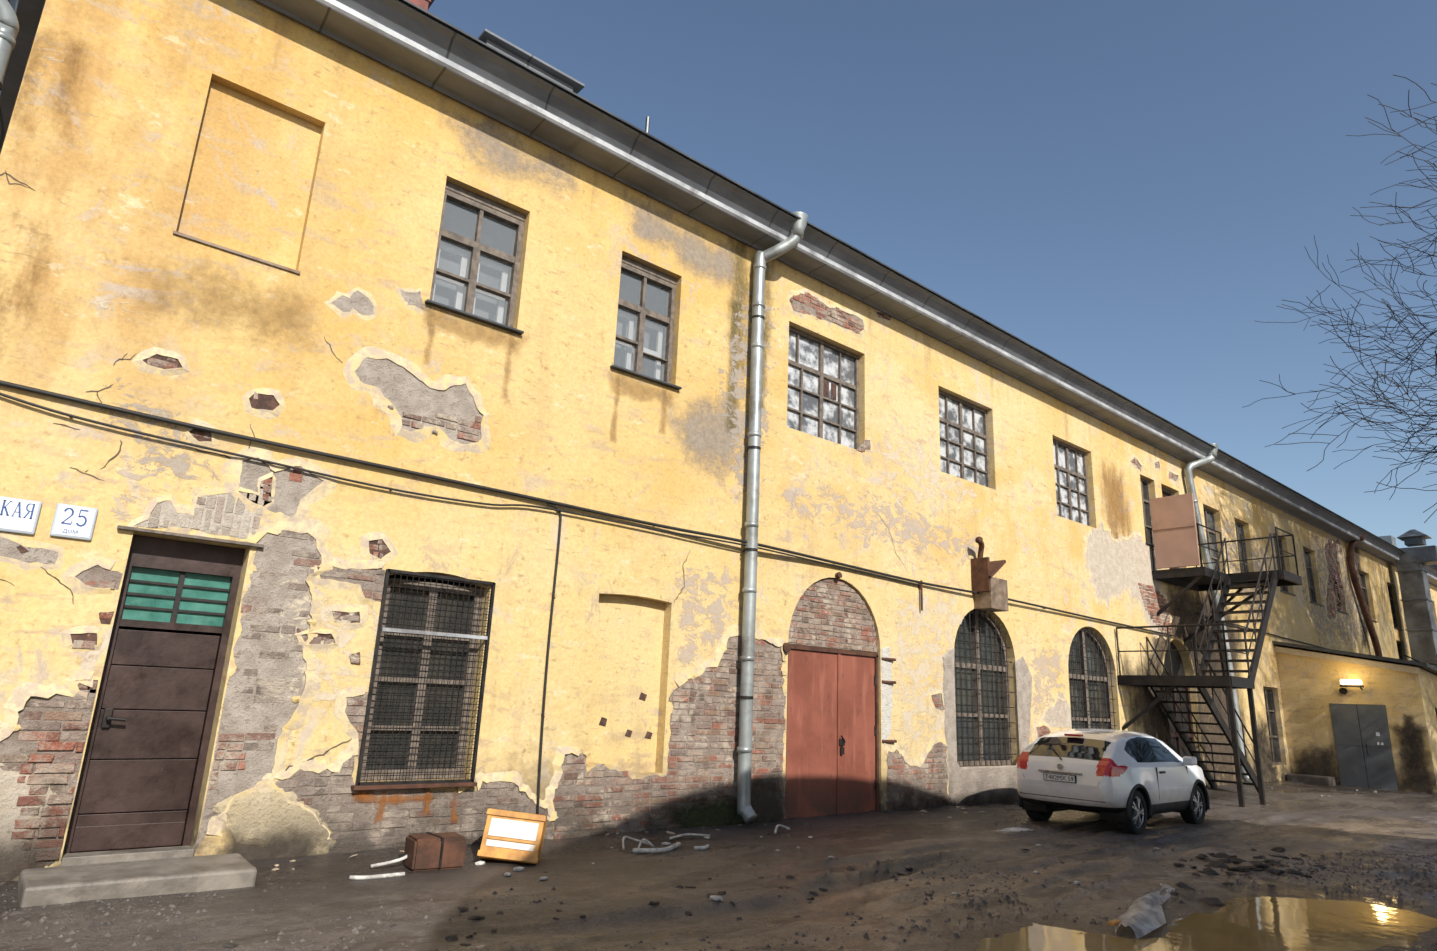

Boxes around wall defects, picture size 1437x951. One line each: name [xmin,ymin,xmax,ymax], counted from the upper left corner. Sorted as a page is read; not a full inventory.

peeling [324,287,377,320]
damp [635,206,748,429]
spalling [131,347,190,377]
spalling [343,346,491,458]
crack [0,567,74,605]
spalling [0,531,123,595]
spalling [60,611,114,651]
spalling [101,378,787,856]
spalling [883,591,964,811]
spalling [0,671,98,882]
damp [1394,715,1432,793]